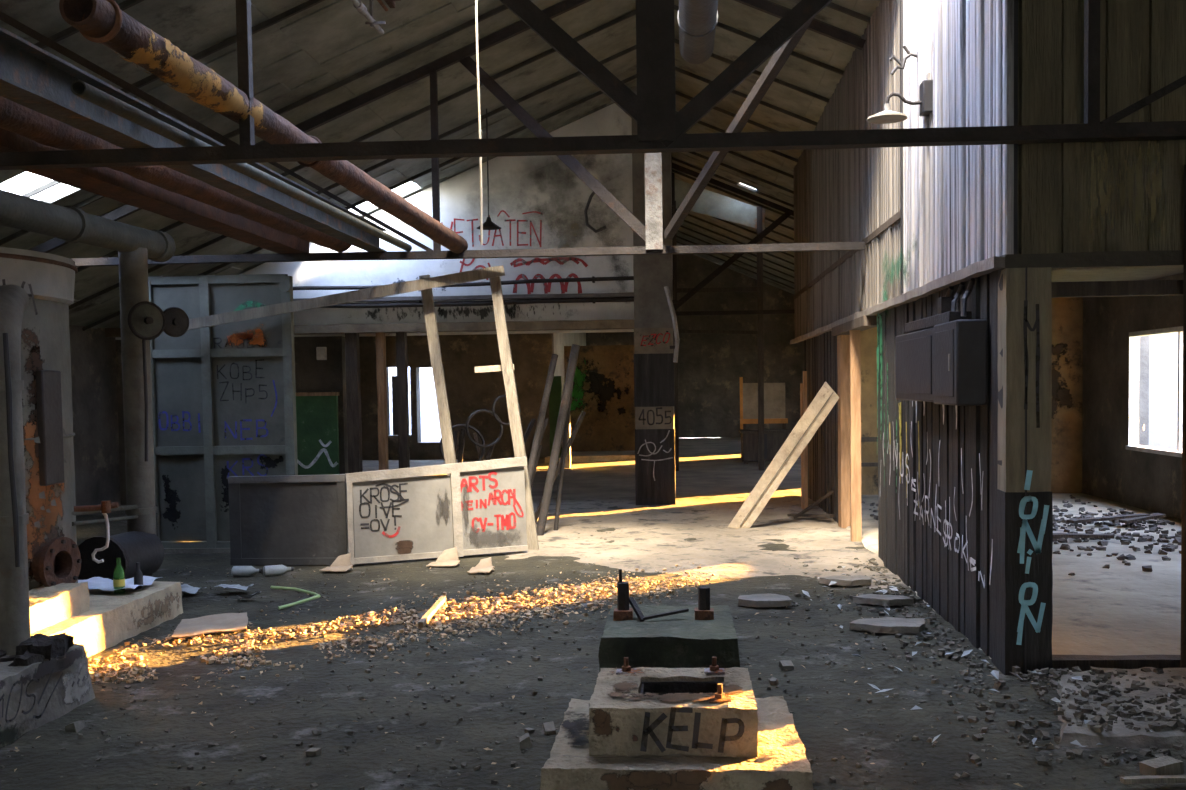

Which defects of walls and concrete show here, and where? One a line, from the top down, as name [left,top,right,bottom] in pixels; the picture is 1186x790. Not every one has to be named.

corrosion [21,328,45,483]